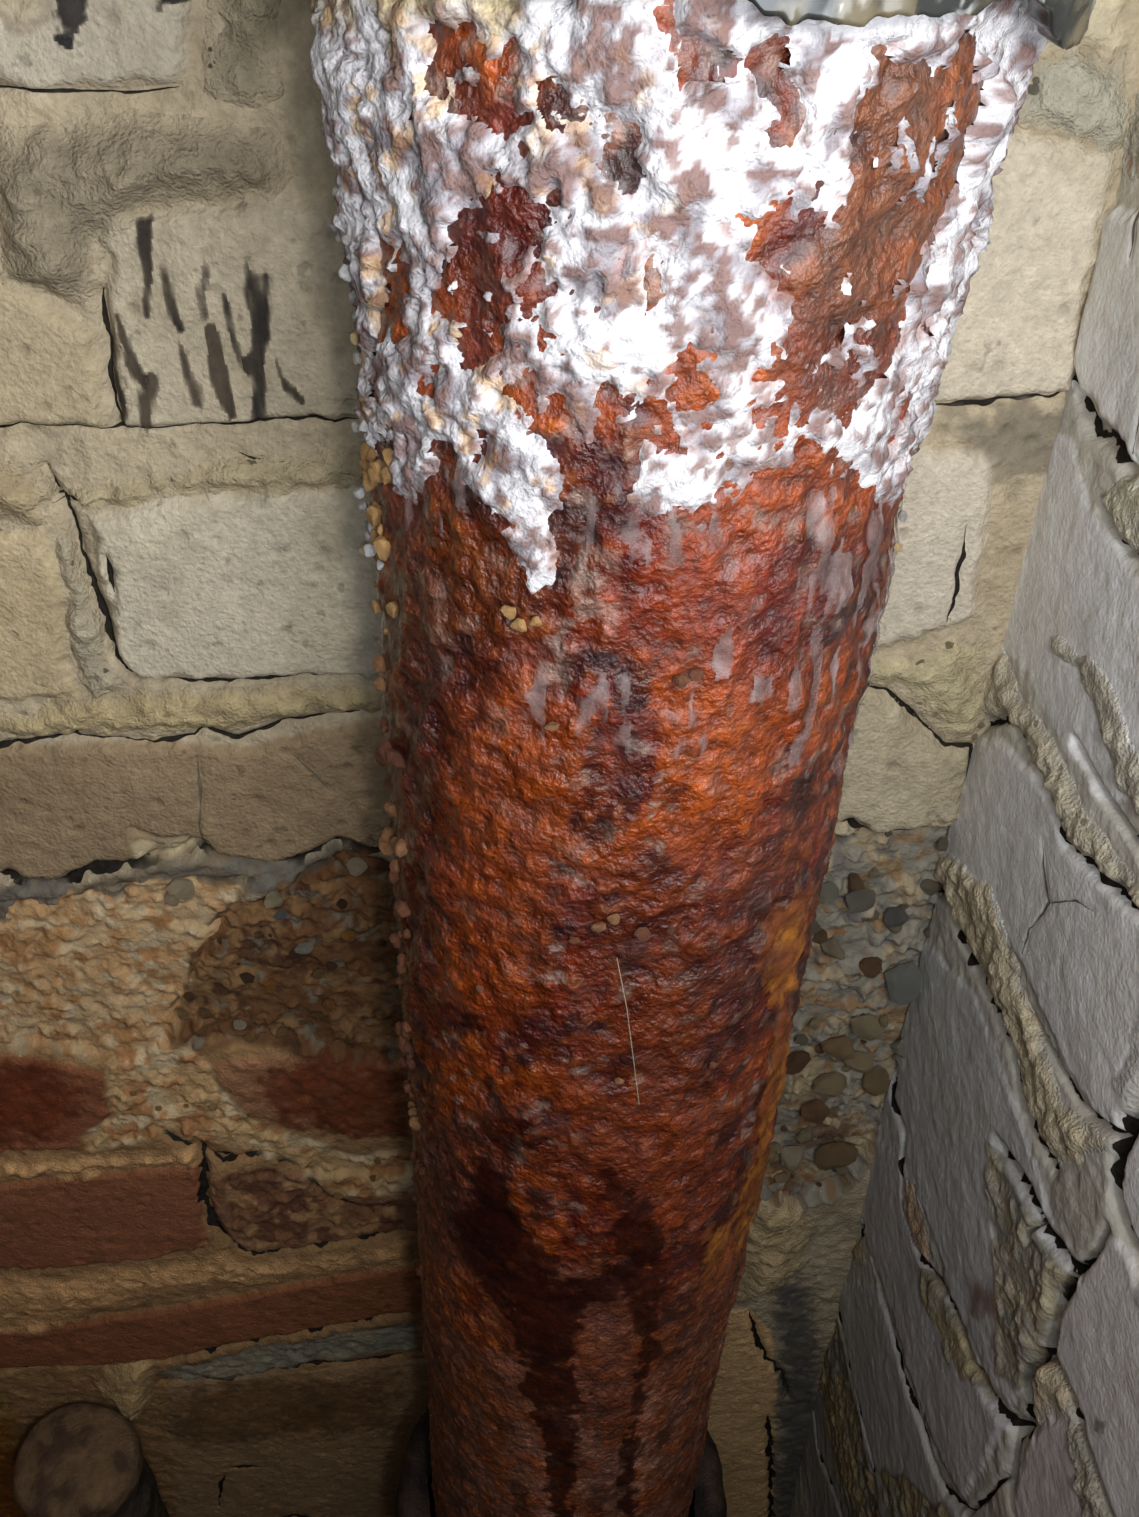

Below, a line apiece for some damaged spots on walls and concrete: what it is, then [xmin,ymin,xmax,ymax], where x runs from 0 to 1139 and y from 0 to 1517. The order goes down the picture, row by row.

crack [0,287,359,462]
leakage [308,0,1048,595]
crack [48,464,324,682]
corrosion [359,443,393,561]
corrosion [373,655,387,692]
corrosion [371,581,399,635]
corrosion [375,716,406,768]
corrosion [500,605,542,632]
corrosion [379,802,411,989]
corrosion [569,913,620,944]
corrosion [698,897,812,1293]
leakage [449,1155,668,1517]